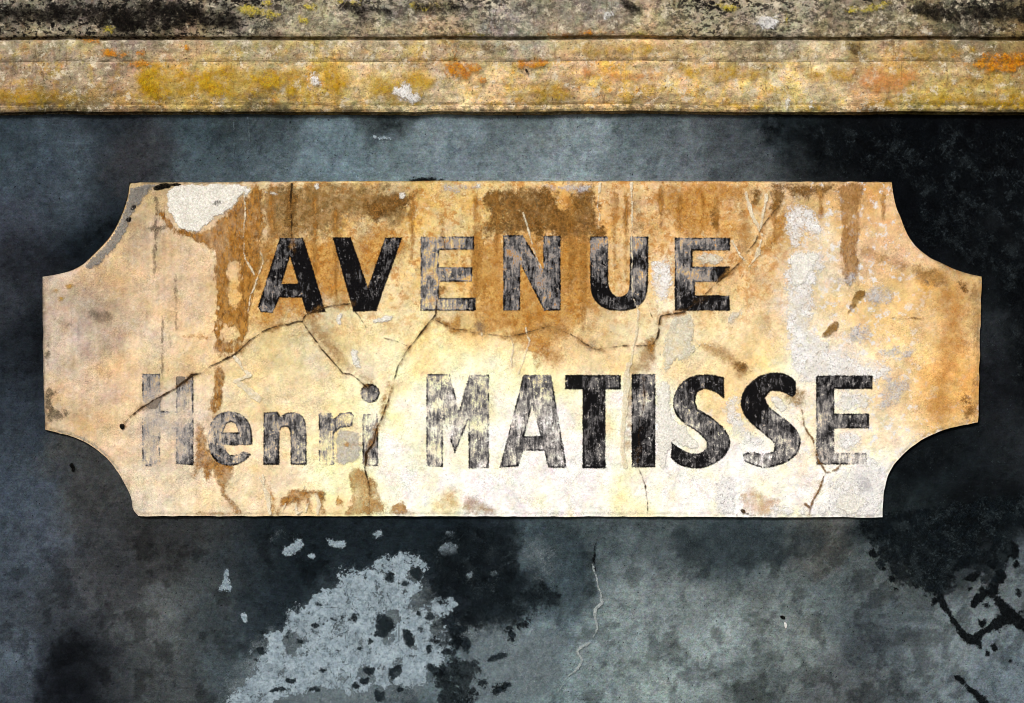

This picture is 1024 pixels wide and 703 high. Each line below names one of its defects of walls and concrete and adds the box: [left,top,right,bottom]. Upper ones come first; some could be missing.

peeling [85,183,251,269]
corrosion [156,186,275,418]
corrosion [470,185,628,328]
crack [500,211,774,350]
corrosion [742,183,863,285]
peeling [282,539,315,559]
crack [127,300,475,491]
corrosion [271,468,407,515]
peeling [227,551,458,703]
crack [801,410,841,512]
damp [857,492,1024,656]
damp [954,675,988,703]